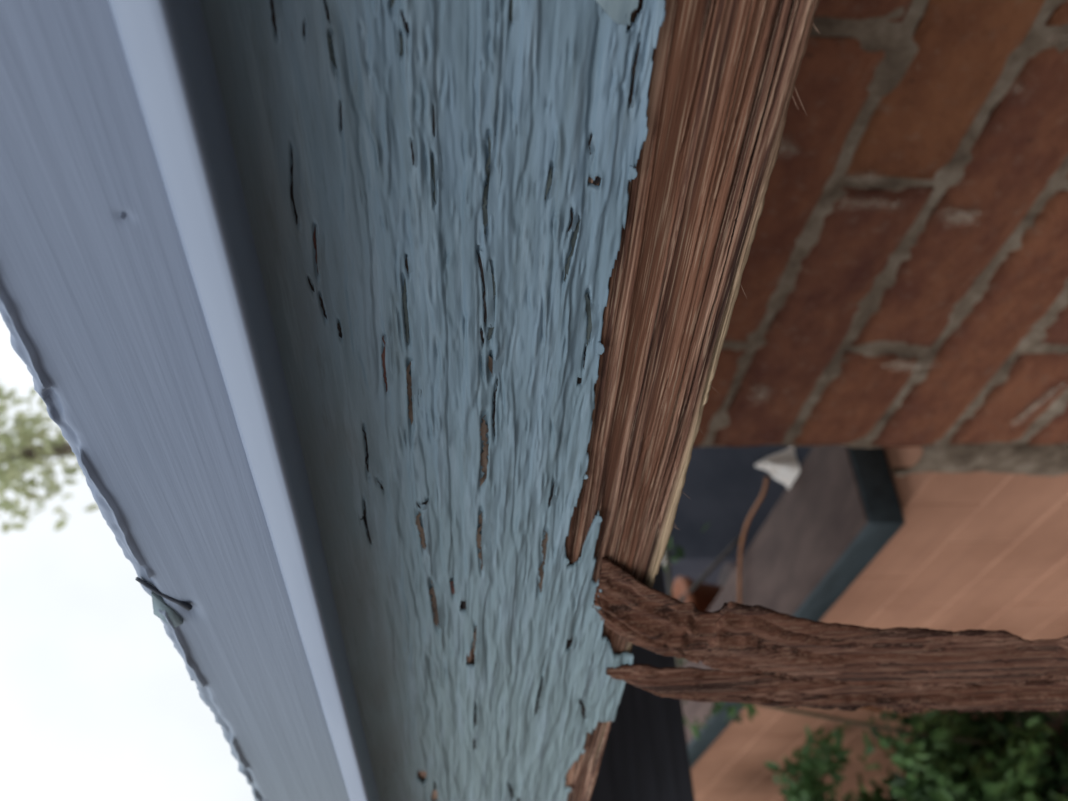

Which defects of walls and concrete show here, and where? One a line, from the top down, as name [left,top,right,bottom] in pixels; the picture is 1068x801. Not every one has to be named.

crack [270,0,348,70]
crack [629,35,648,109]
crack [411,104,443,204]
crack [290,145,342,338]
crack [381,257,423,425]
crack [429,135,505,629]
crack [545,167,599,368]
peeling [563,0,820,588]
crack [538,480,558,592]
crack [135,577,192,628]
crack [535,678,548,714]
peeling [565,721,612,801]